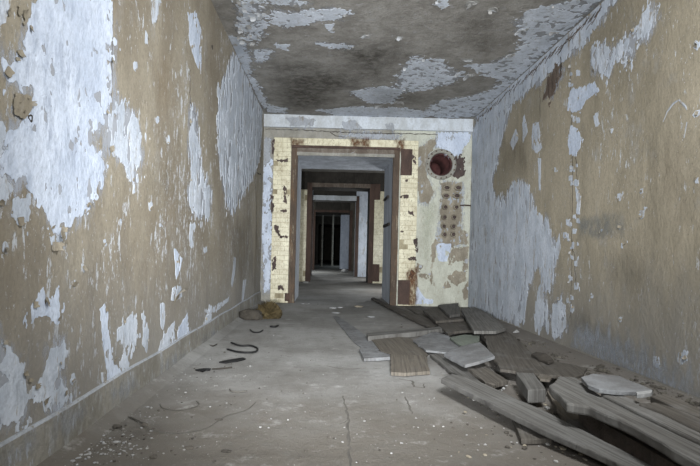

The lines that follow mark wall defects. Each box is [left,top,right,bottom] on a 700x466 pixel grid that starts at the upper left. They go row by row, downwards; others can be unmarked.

peeling [0,0,147,251]
peeling [216,0,661,340]
peeling [0,337,80,433]
peeling [23,285,65,329]
peeling [100,303,149,383]
peeling [159,248,189,351]
crack [330,396,352,466]
corrosion [407,267,418,305]